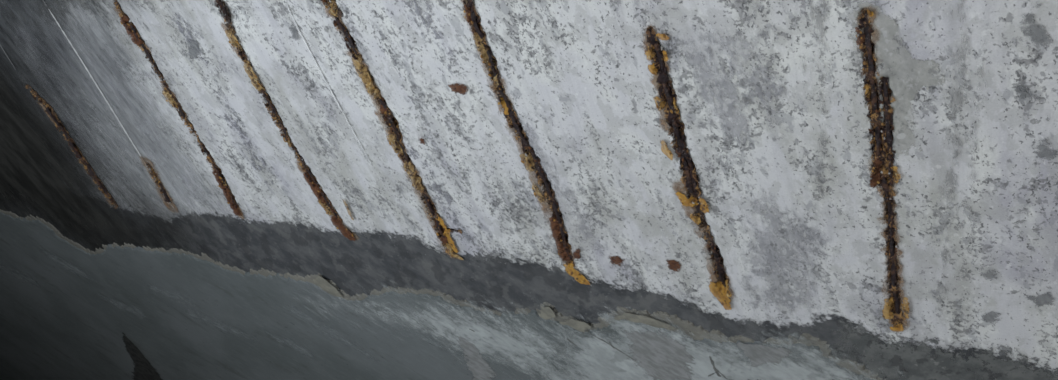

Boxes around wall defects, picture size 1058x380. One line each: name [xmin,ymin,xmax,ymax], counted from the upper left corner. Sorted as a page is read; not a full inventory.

rust [114,0,244,219]
rust [221,24,357,241]
rust [323,0,463,260]
peeling [0,209,883,380]
rust [448,83,468,95]
rust [461,0,590,285]
rust [643,26,732,310]
rust [855,7,909,332]